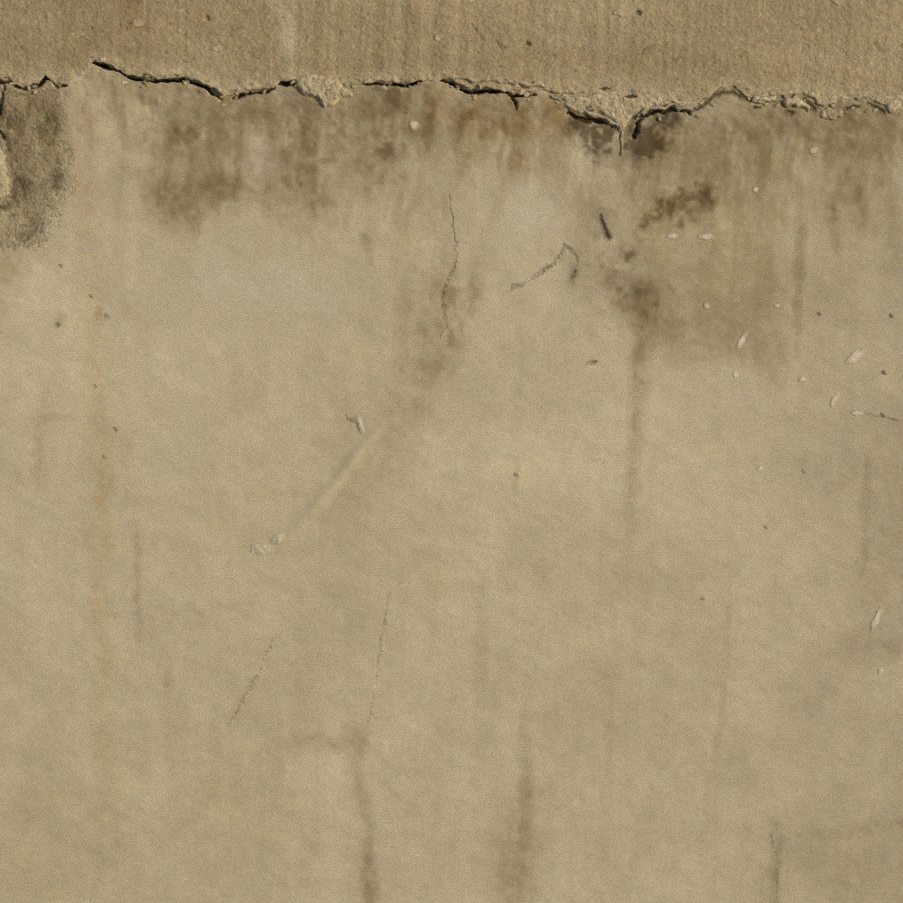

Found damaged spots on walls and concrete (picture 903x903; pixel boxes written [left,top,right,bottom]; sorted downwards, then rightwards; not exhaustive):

crack [93,62,215,96]
crack [237,81,294,98]
crack [364,80,524,107]
crack [568,112,605,124]
crack [633,88,763,139]
crack [785,96,819,117]
crack [844,102,888,115]
spalling [0,81,82,254]
crack [507,243,580,293]
water stain [93,0,903,685]
water stain [468,699,559,903]
water stain [758,811,903,903]